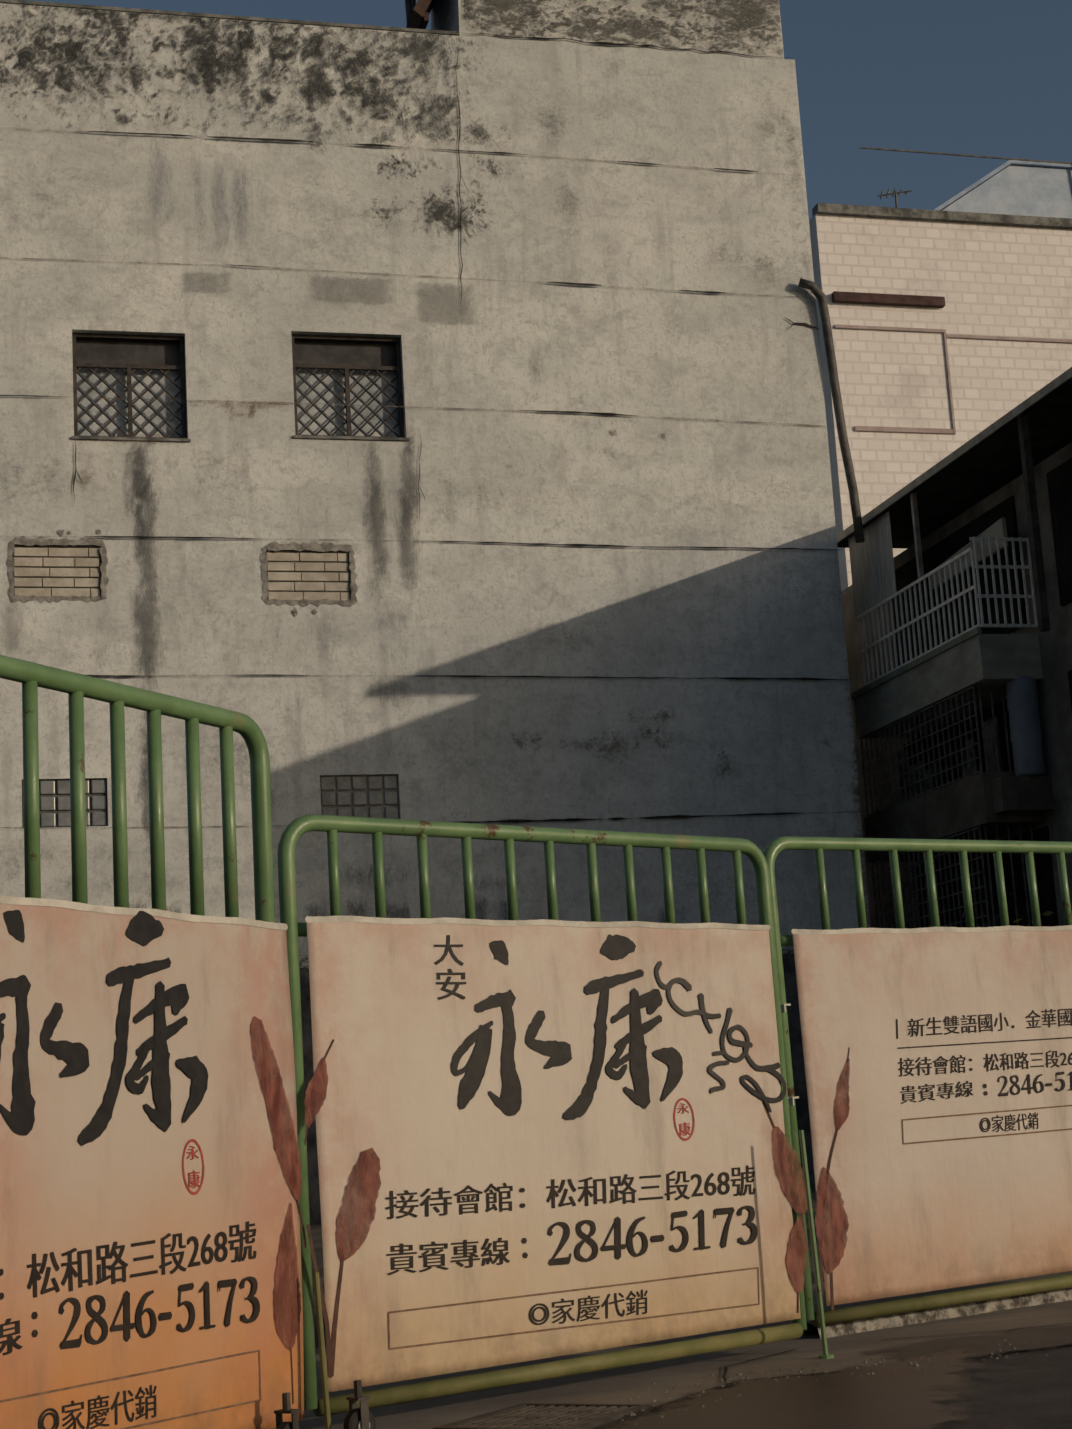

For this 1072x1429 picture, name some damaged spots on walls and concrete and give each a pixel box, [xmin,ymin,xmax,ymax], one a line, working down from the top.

crack [46,129,317,142]
water stain [0,0,783,241]
water stain [126,448,159,673]
water stain [368,439,418,578]